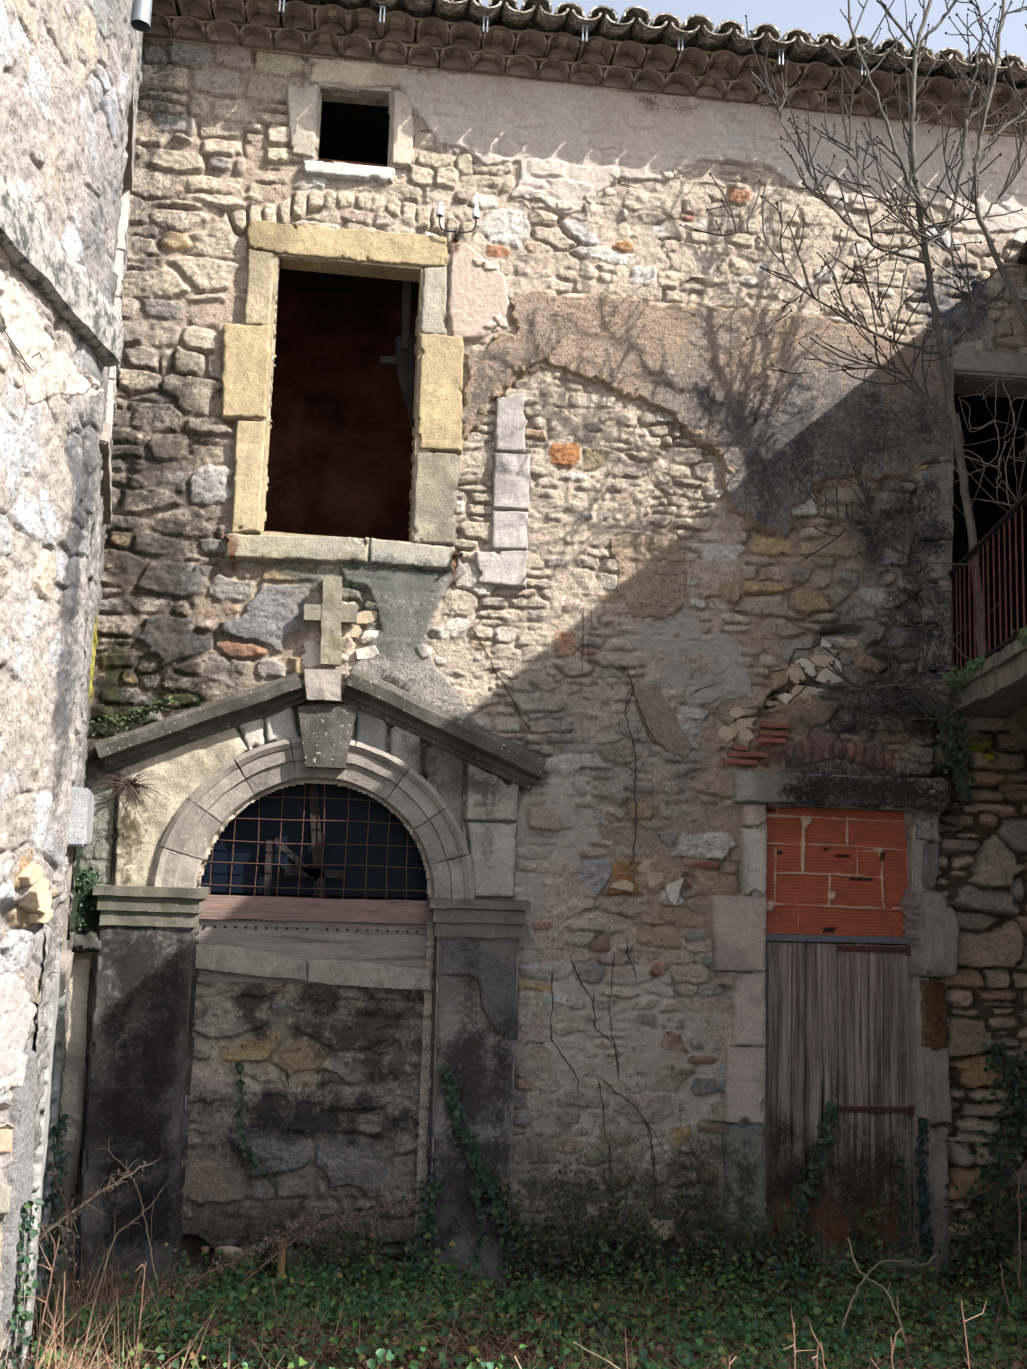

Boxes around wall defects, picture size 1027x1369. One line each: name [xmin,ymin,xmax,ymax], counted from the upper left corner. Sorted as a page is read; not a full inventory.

peeling [472,258,499,271]
flaking render [395,72,1027,234]
flaking render [462,288,956,539]
leakage [688,389,936,508]
leakage [53,378,212,800]
leakage [100,936,371,1274]
leakage [209,983,516,1247]